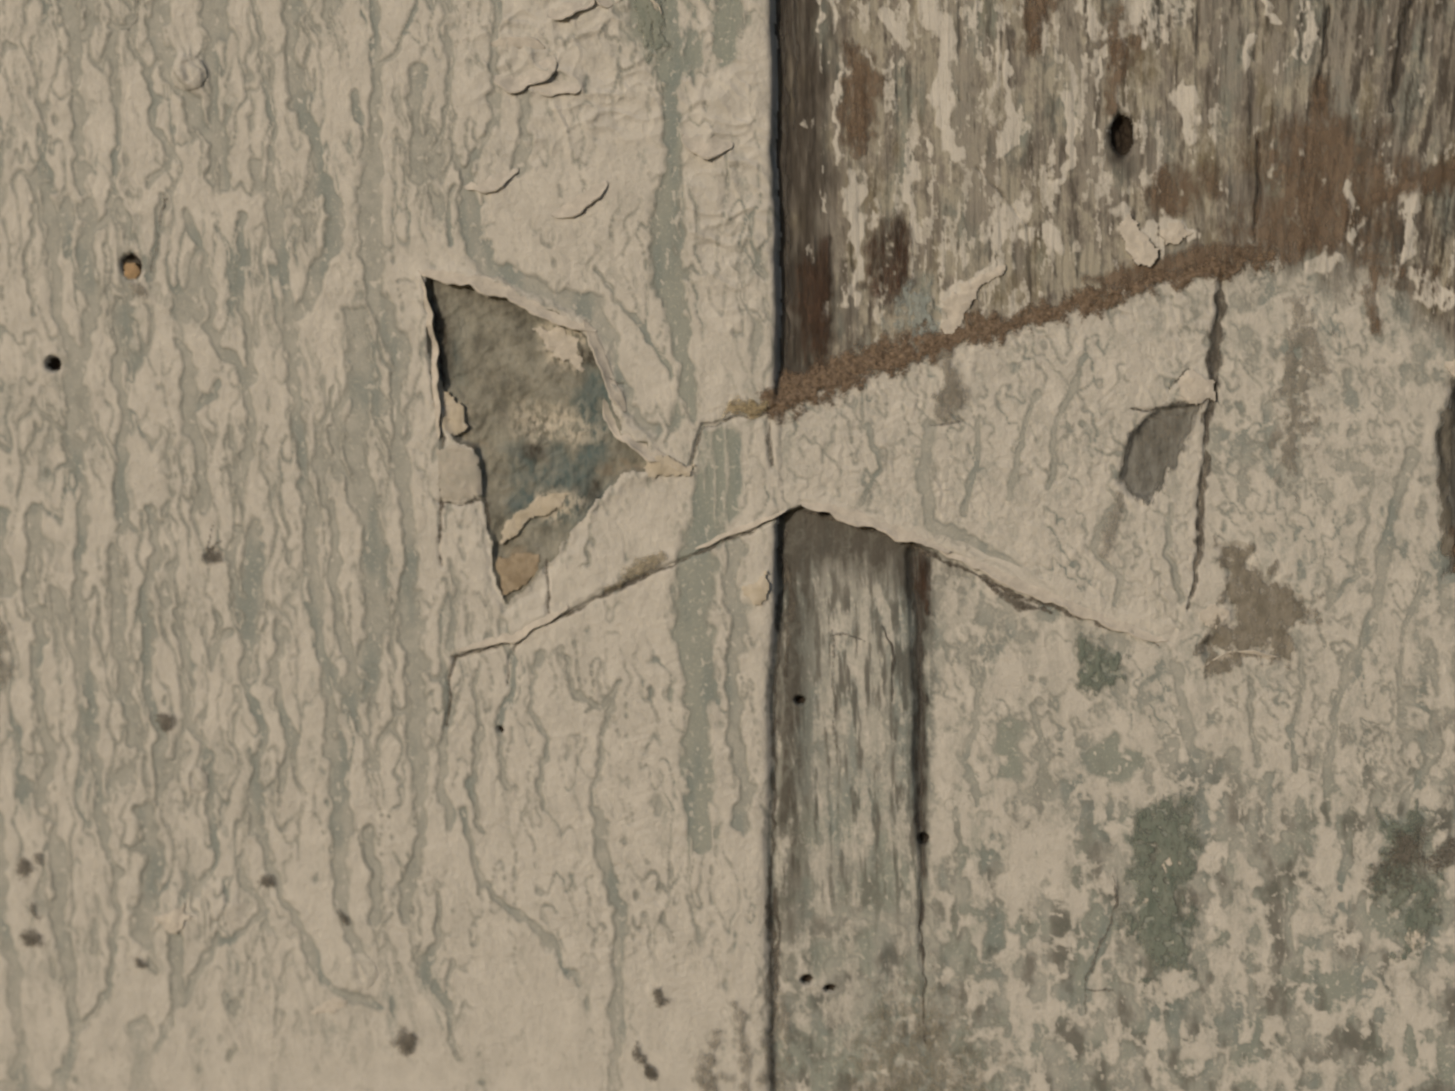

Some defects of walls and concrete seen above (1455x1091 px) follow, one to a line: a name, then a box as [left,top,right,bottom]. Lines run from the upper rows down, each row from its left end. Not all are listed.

peeling [490,35,583,97]
peeling [547,0,669,63]
spalling [418,269,695,604]
crack [692,416,773,465]
peeling [1119,369,1216,505]
crack [1130,275,1227,609]
peeling [1193,544,1322,678]